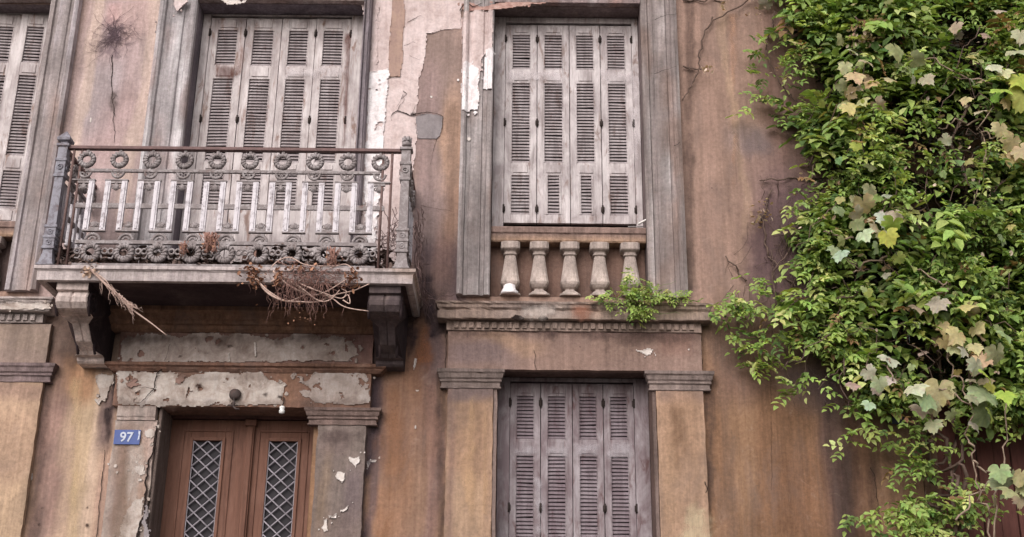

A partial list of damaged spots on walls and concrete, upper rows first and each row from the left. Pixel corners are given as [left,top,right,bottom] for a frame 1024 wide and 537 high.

crack [109,55,117,139]
flaking render [361,0,546,268]
peeling [94,332,375,408]
flaking render [107,461,147,481]
peeling [333,452,380,483]
flaking render [113,497,151,537]